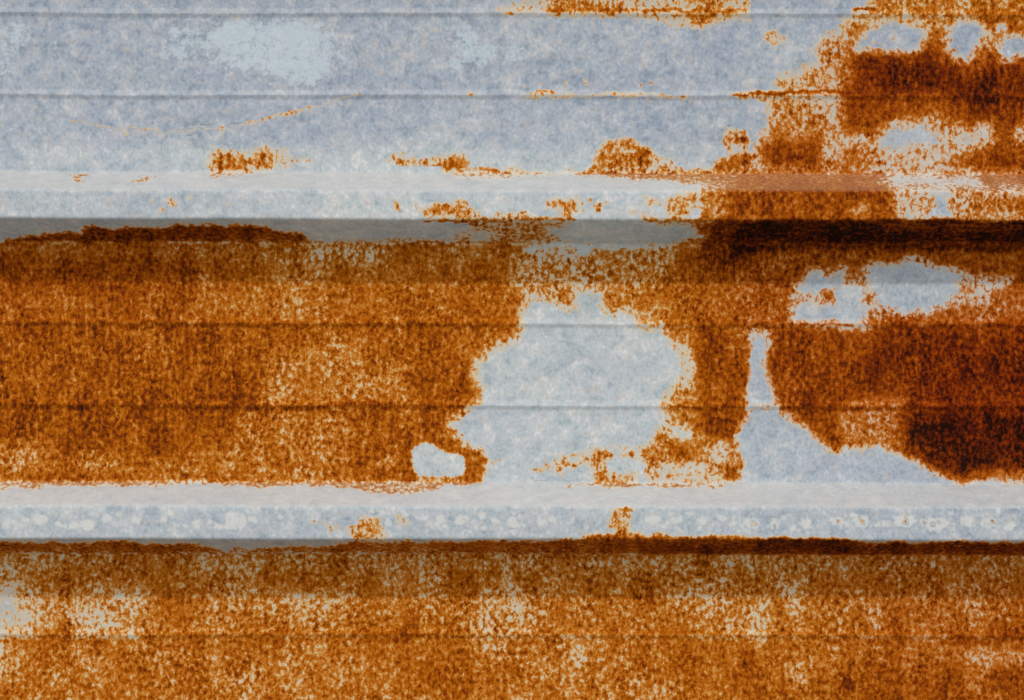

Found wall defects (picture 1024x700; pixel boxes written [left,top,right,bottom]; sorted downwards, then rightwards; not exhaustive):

rust [0,0,1024,500]
rust [0,504,1024,700]